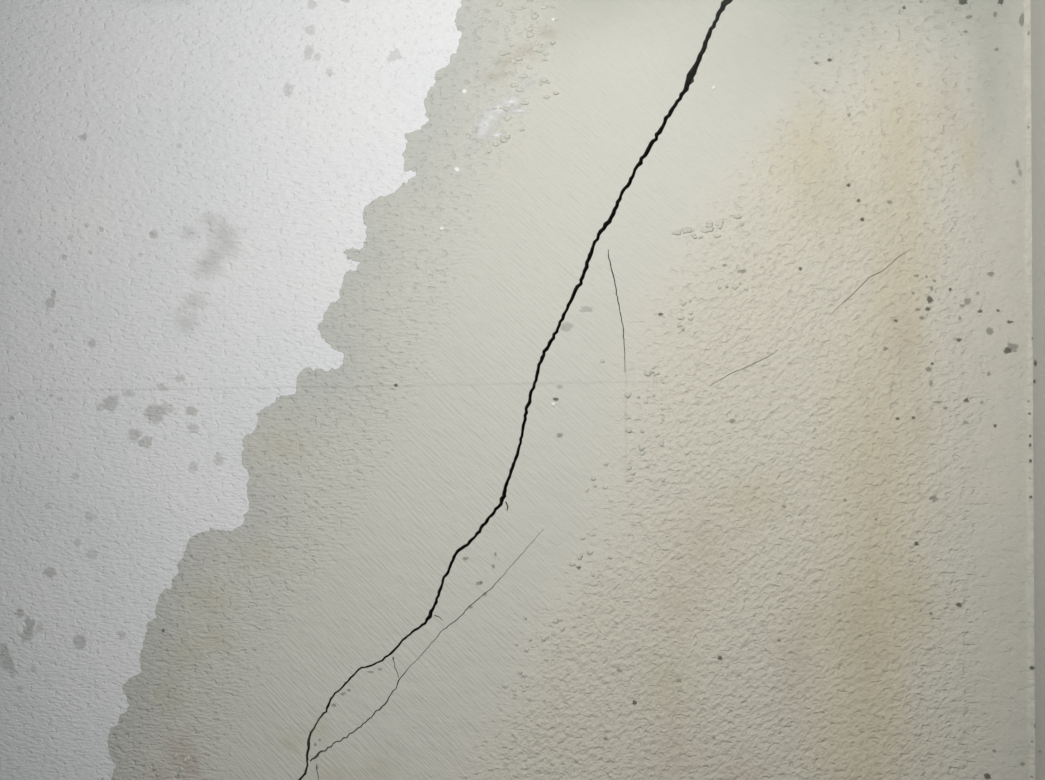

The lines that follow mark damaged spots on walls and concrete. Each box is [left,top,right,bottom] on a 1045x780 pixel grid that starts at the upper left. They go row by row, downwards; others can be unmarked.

peeling [672,214,744,239]
crack [829,248,912,316]
crack [298,0,733,780]